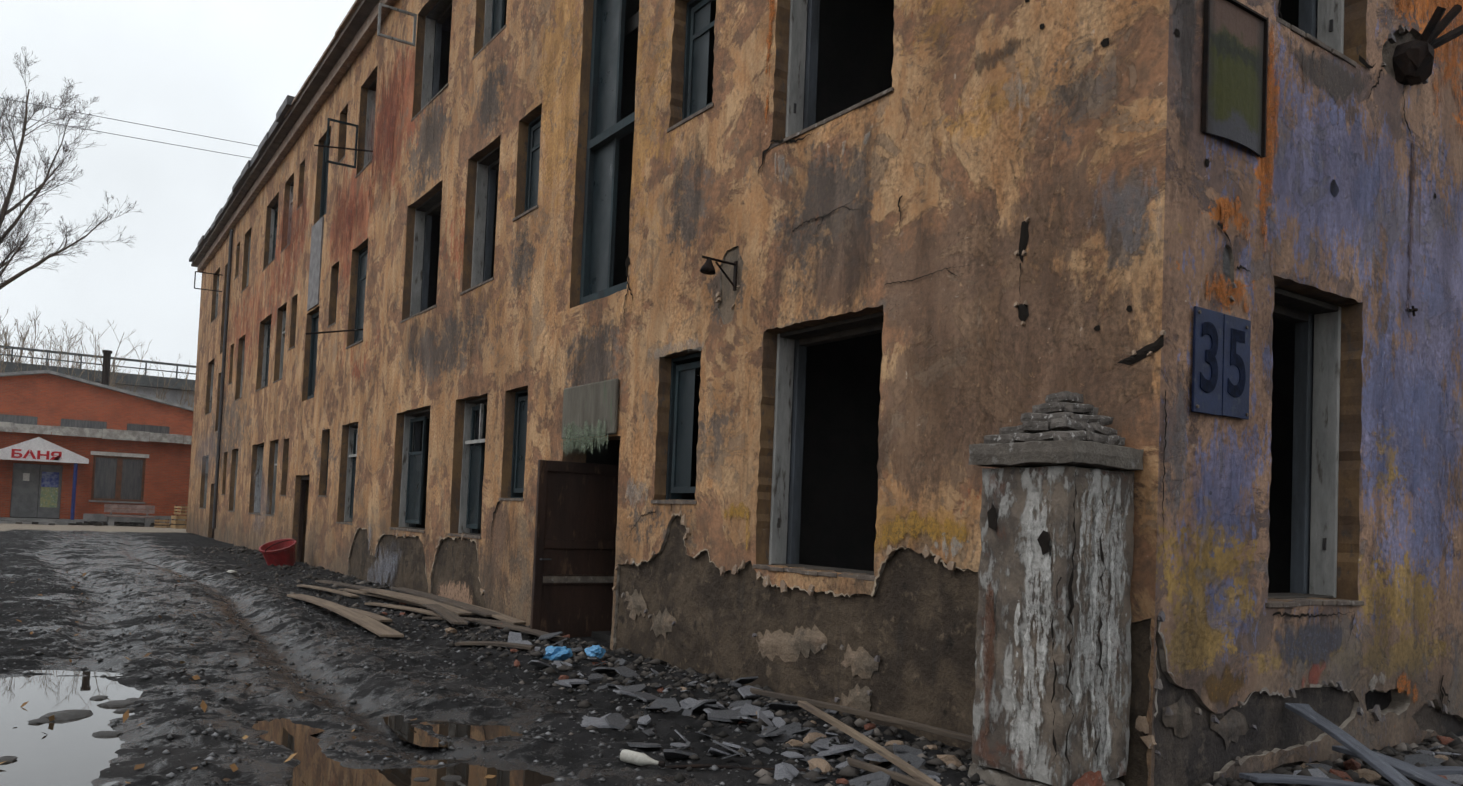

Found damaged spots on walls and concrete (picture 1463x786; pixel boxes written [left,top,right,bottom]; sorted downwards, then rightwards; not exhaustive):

spalling [1381,25,1416,79]
crack [792,195,903,239]
spalling [987,504,997,531]
spalling [347,527,486,616]
spalling [592,510,979,751]
peeling [1010,498,1056,762]
spalling [1072,493,1392,786]
spalling [1412,700,1463,745]